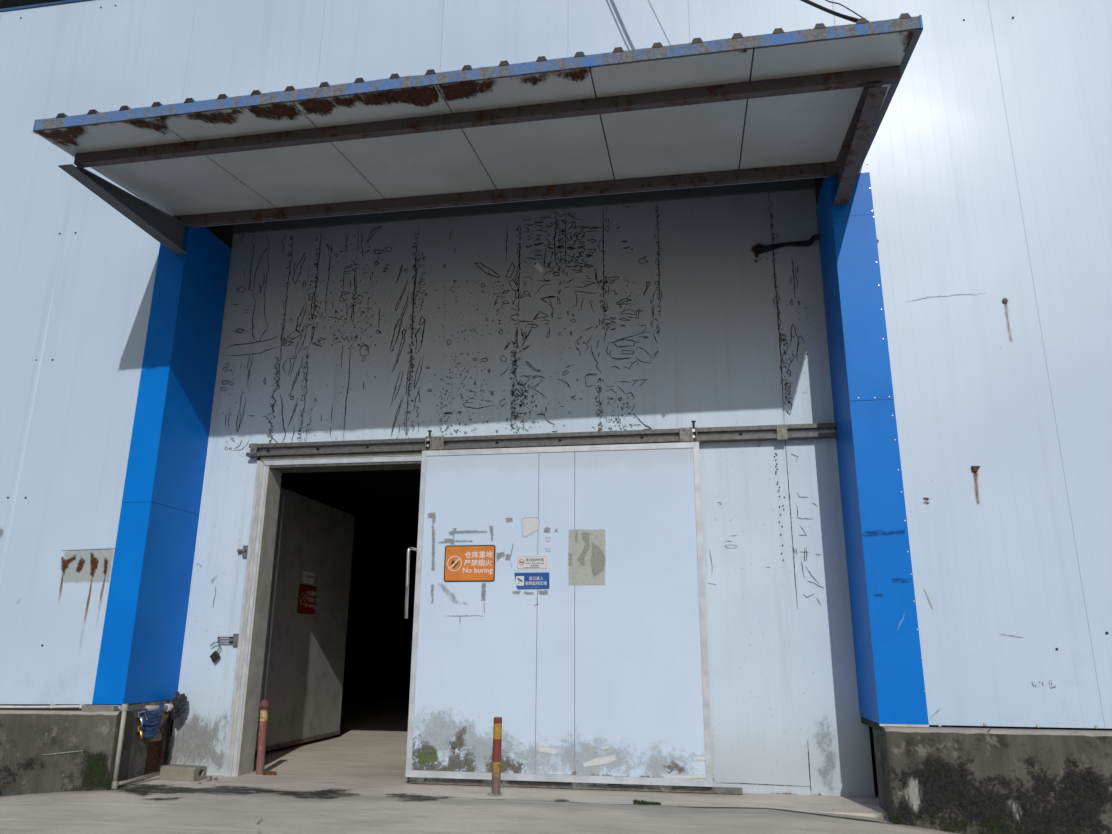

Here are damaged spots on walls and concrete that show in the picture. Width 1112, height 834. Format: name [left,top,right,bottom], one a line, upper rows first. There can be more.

rust [33,125,92,147]
rust [123,79,496,134]
rust [511,69,592,86]
peeling [221,202,662,451]
peeling [768,193,810,424]
rust [59,548,115,612]
peeling [582,745,617,767]
damp [887,754,1112,834]